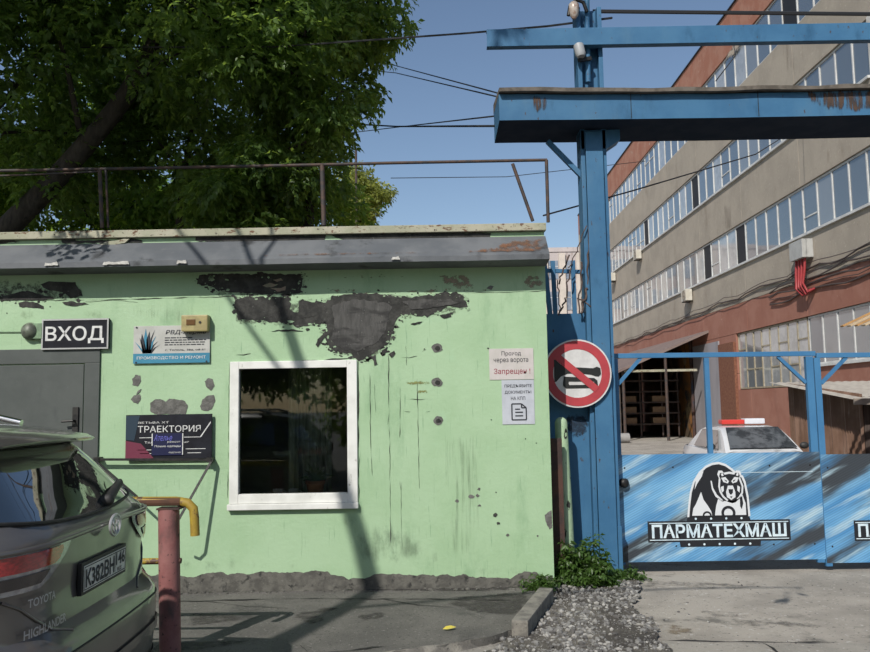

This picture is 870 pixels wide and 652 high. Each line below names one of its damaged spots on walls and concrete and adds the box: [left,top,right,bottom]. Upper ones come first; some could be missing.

corrosion [808,90,870,111]
corrosion [470,240,539,252]
flaking render [0,281,87,309]
flaking render [196,272,472,453]